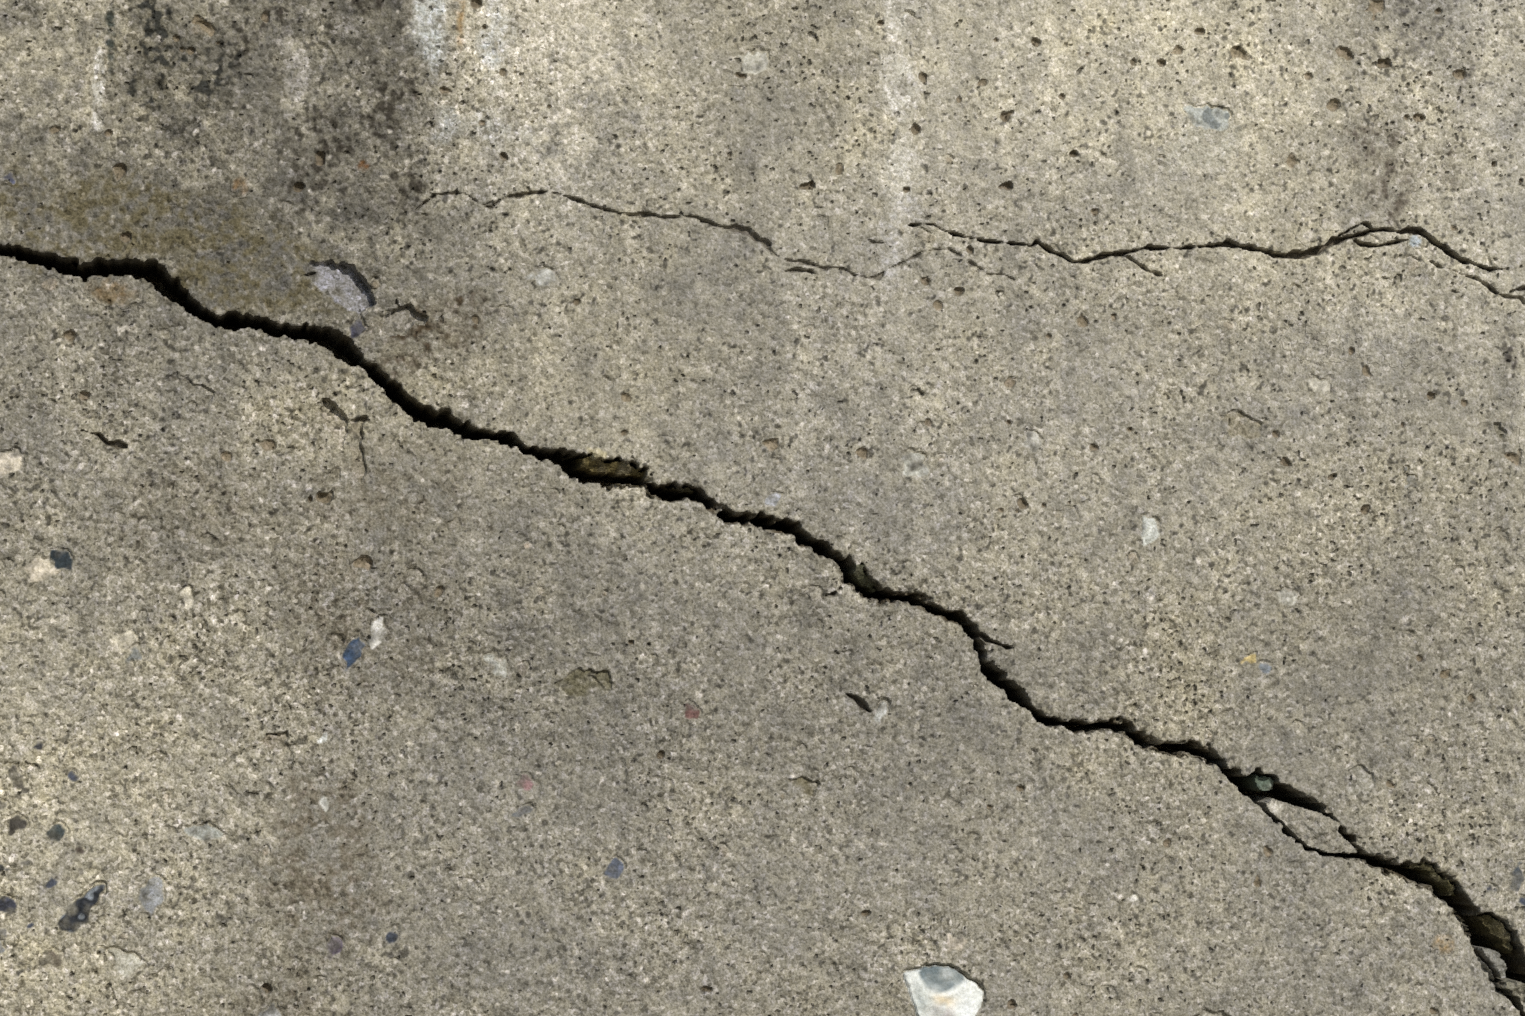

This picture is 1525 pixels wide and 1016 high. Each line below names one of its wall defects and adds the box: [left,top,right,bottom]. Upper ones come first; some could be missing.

crack [0,242,1525,1016]
crack [417,190,1525,306]